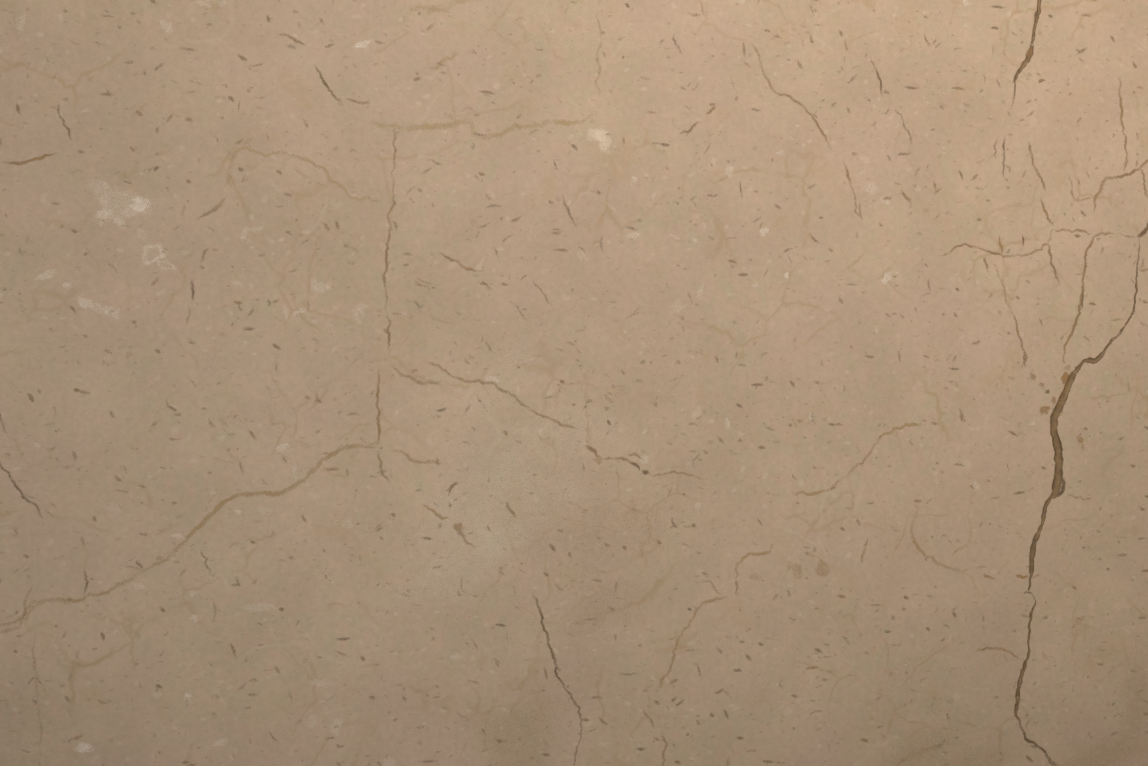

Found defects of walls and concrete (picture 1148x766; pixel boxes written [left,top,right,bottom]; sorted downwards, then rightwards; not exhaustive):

crack [1011,0,1042,108]
crack [943,78,1148,766]
crack [532,595,583,766]